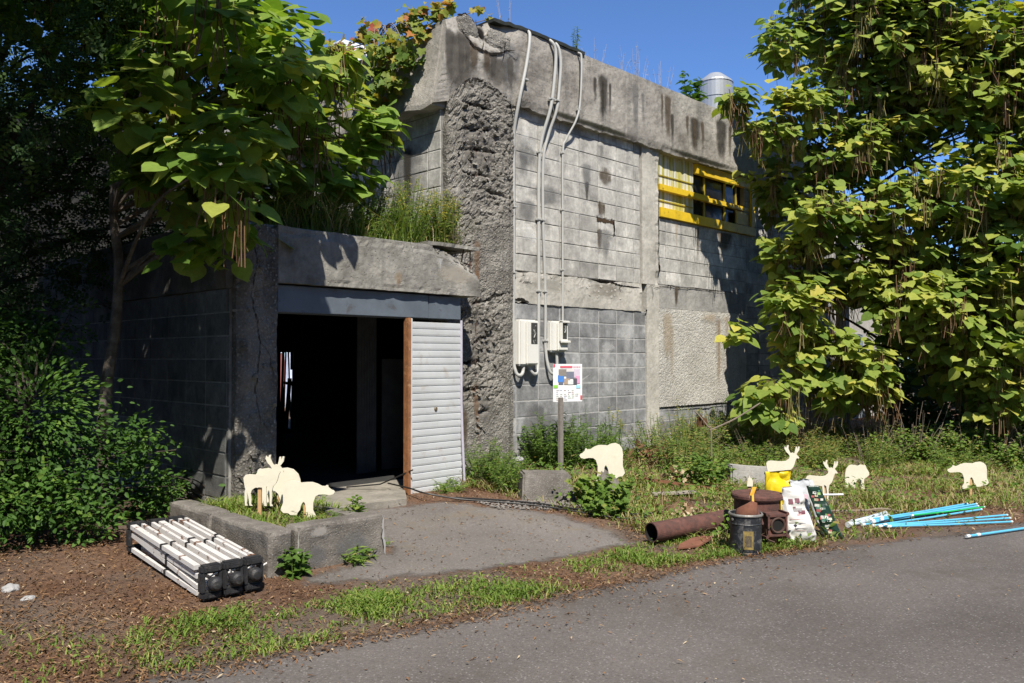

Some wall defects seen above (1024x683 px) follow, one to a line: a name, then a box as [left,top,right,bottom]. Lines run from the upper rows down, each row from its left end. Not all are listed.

spalling [456,12,514,56]
spalling [457,104,500,188]
damp [594,75,611,112]
damp [661,95,704,147]
crack [250,247,274,434]
spalling [461,302,497,432]